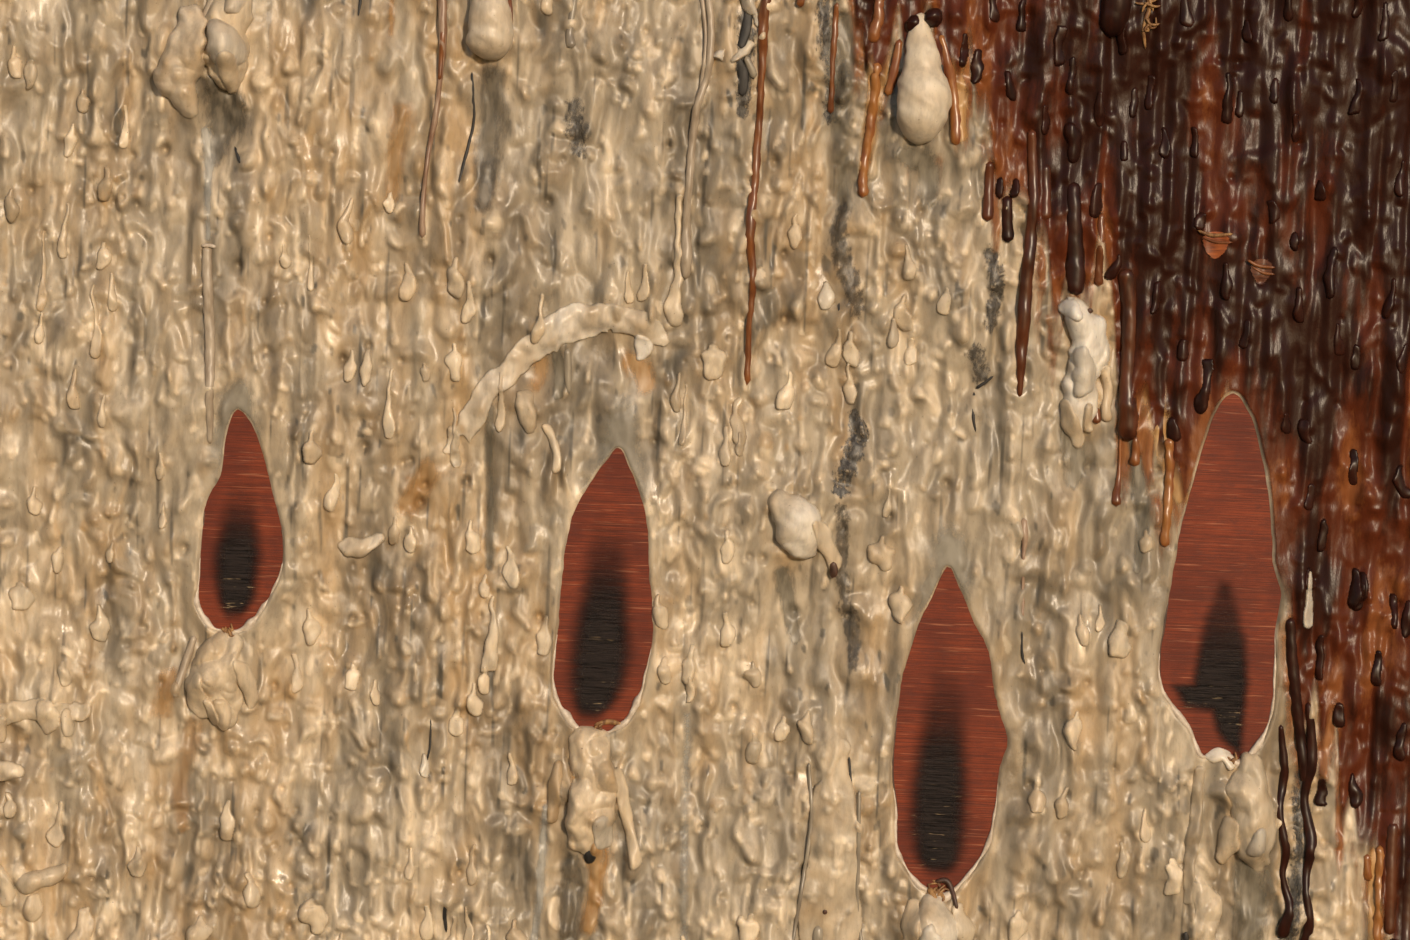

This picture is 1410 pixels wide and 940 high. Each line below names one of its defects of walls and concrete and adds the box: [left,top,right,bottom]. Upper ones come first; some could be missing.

rust [744,0,771,385]
rust [857,0,890,198]
rust [953,64,968,142]
rust [1094,213,1105,286]
peeling [194,381,283,637]
peeling [552,400,653,733]
rust [1111,390,1188,547]
peeling [1158,393,1281,767]
peeling [892,529,1007,909]
rust [1363,845,1385,940]